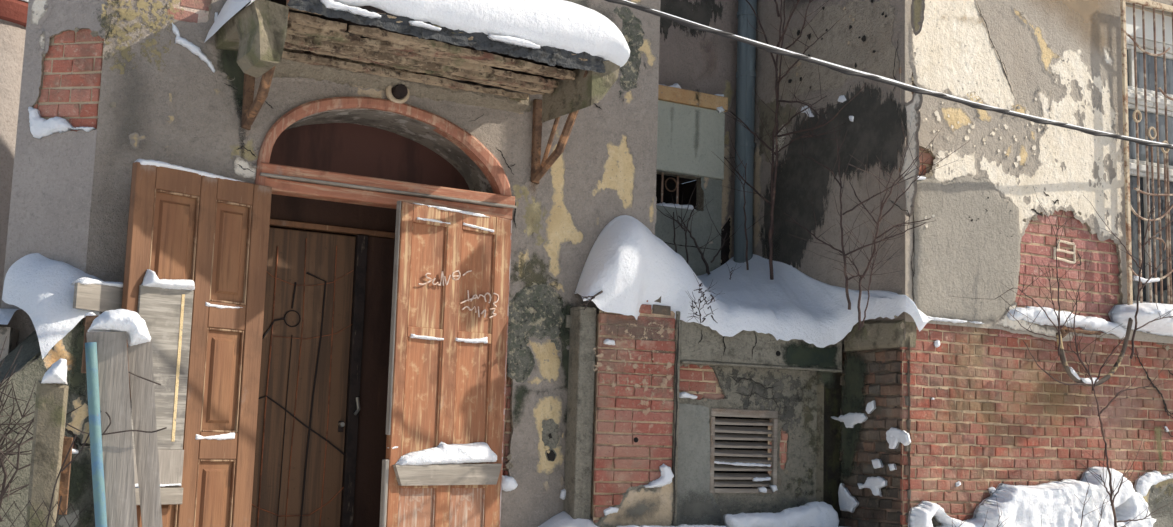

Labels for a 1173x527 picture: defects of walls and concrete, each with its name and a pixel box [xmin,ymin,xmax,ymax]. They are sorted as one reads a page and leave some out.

spalling [27,0,116,132]
water stain [98,0,171,74]
spalling [167,0,212,23]
spalling [614,0,658,108]
water stain [660,0,723,40]
peeling [588,132,657,226]
water stain [760,83,913,269]
spalling [502,126,586,479]
spalling [894,0,1173,527]
peeling [38,336,73,376]
peeling [64,393,91,458]
spalling [679,364,724,402]